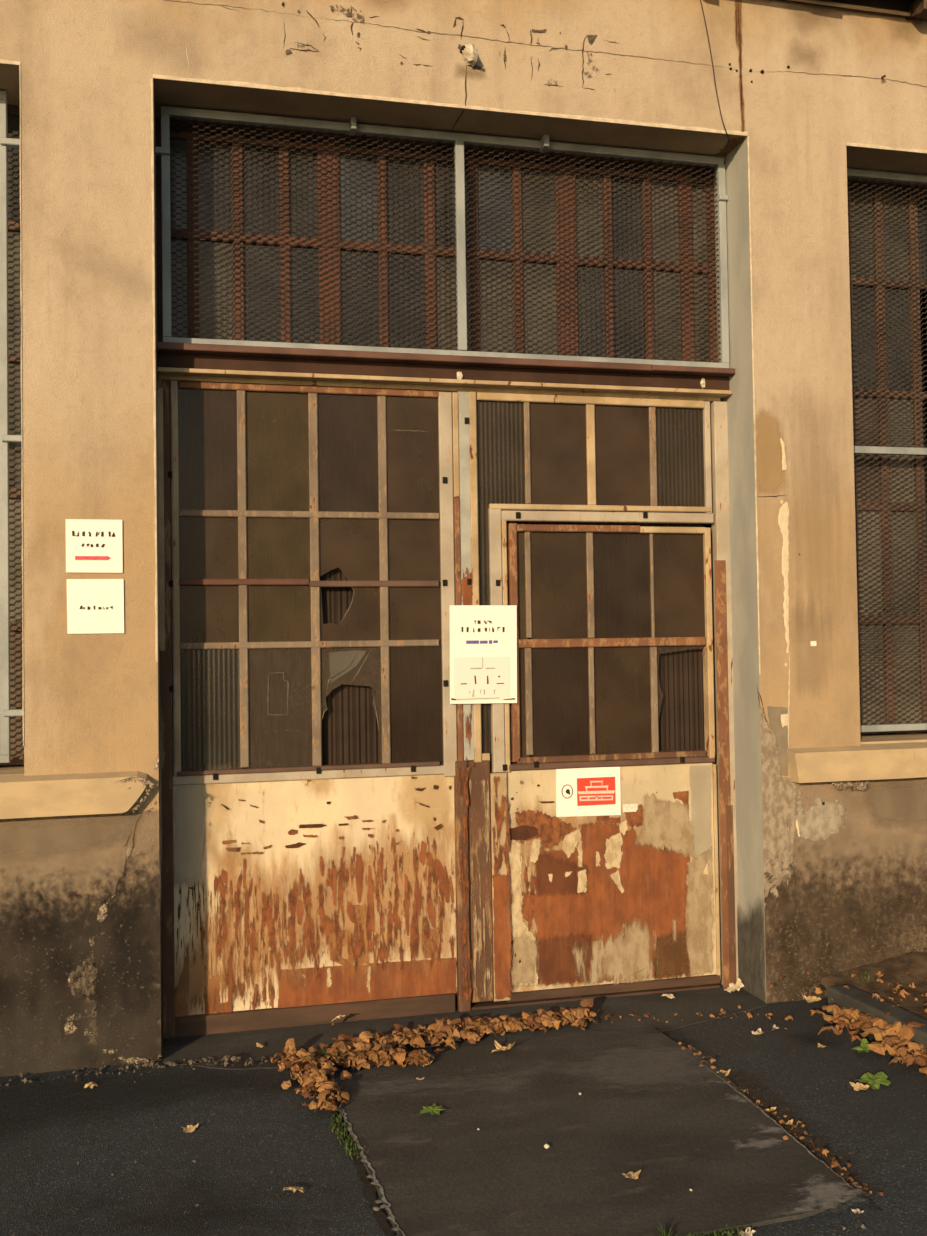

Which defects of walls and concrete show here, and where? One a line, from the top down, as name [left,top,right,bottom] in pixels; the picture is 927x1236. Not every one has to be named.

rust [461,568,473,605]
flaking render [760,500,869,911]
water stain [0,651,206,1077]
peeling [222,815,402,855]
rust [175,704,475,1017]
peeling [469,776,541,999]
rust [509,784,690,986]
peeling [575,921,653,984]
peeling [548,793,709,893]
water stain [737,865,927,1003]